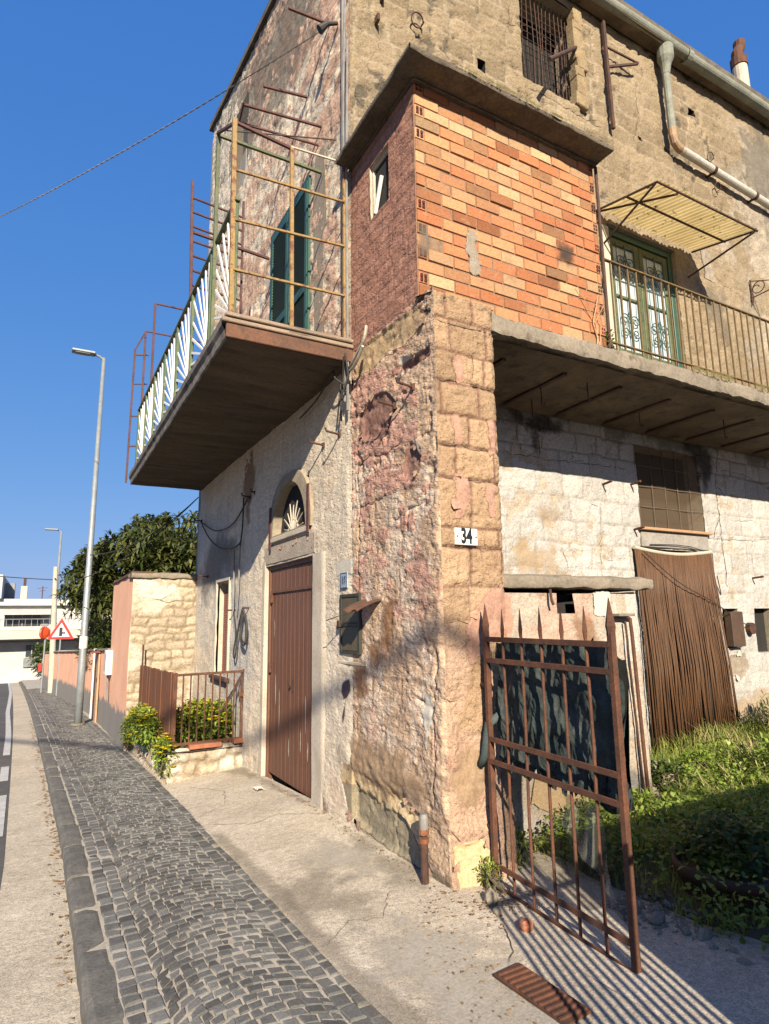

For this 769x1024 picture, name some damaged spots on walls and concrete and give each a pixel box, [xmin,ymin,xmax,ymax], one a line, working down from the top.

spalling [359,391,395,445]
water stain [512,411,560,447]
spalling [401,443,421,481]